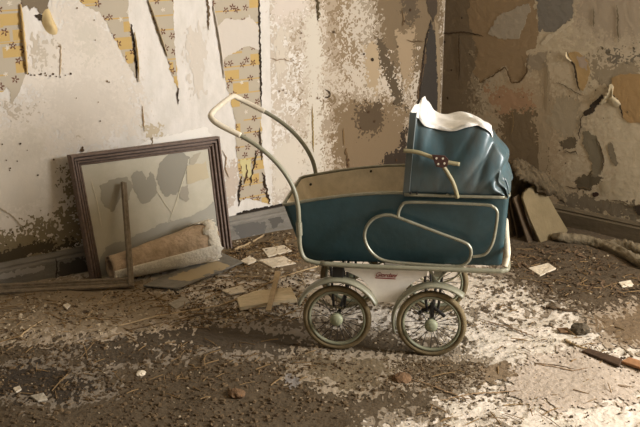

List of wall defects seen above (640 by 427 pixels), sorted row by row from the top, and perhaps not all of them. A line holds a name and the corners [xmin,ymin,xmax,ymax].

spalling [461,0,574,83]
leakage [0,0,164,262]
leakage [265,0,640,221]
spalling [583,89,605,116]
spalling [612,73,640,123]